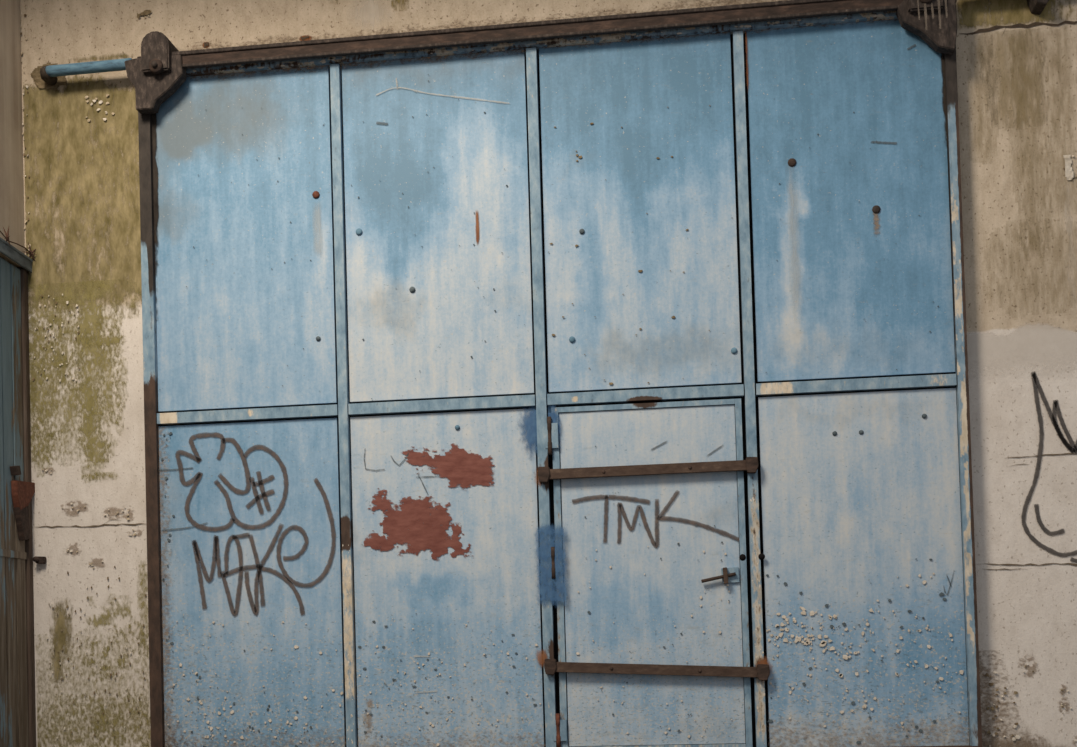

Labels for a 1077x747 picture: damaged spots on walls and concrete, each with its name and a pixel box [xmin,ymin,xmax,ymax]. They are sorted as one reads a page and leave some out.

crack [959,20,1077,34]
water stain [29,285,121,474]
water stain [50,601,72,680]
water stain [84,565,148,675]
peeling [979,650,1037,747]